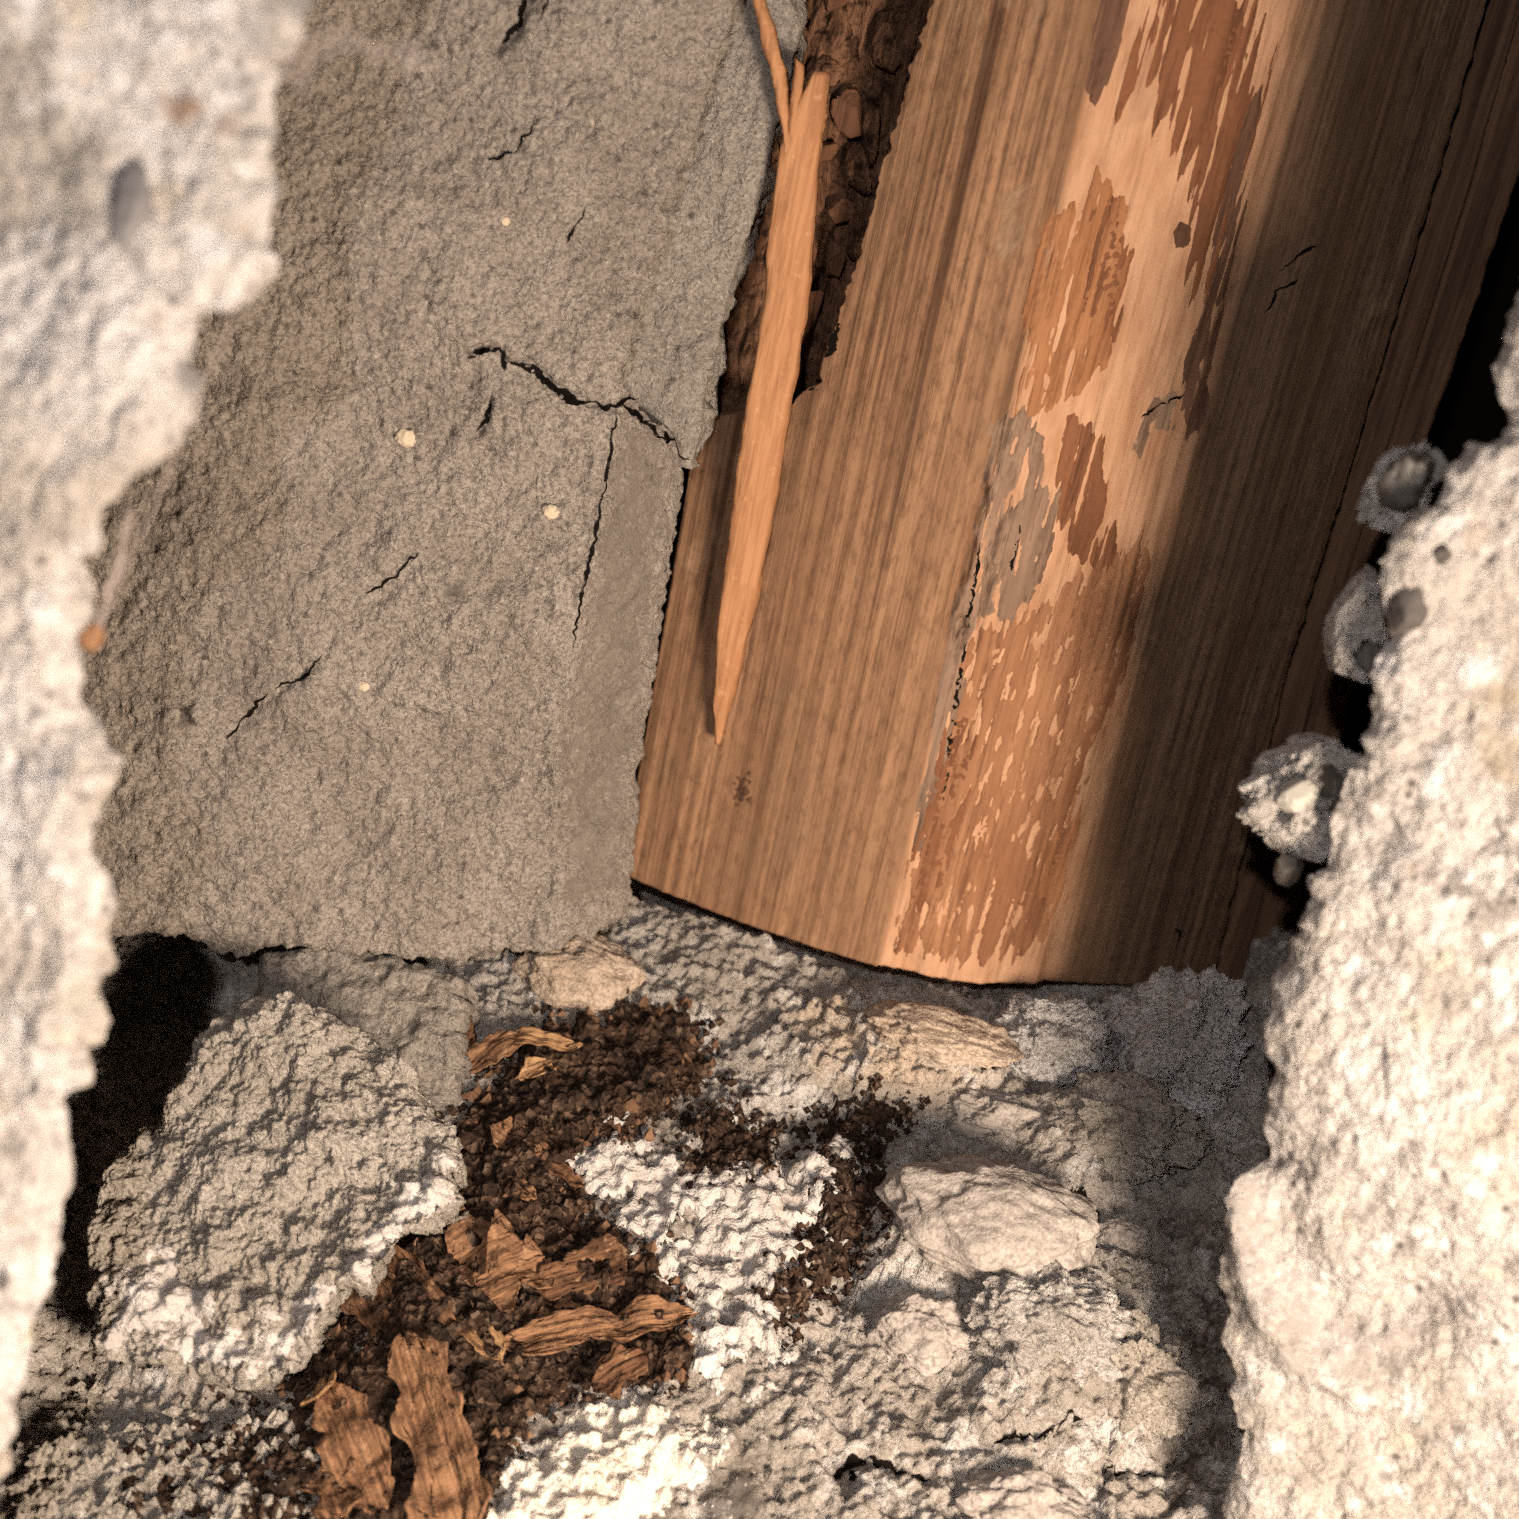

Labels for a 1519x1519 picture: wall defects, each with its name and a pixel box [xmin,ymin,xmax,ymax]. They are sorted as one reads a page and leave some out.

crack [488,121,534,161]
crack [566,208,586,244]
crack [366,553,418,594]
crack [226,655,322,739]